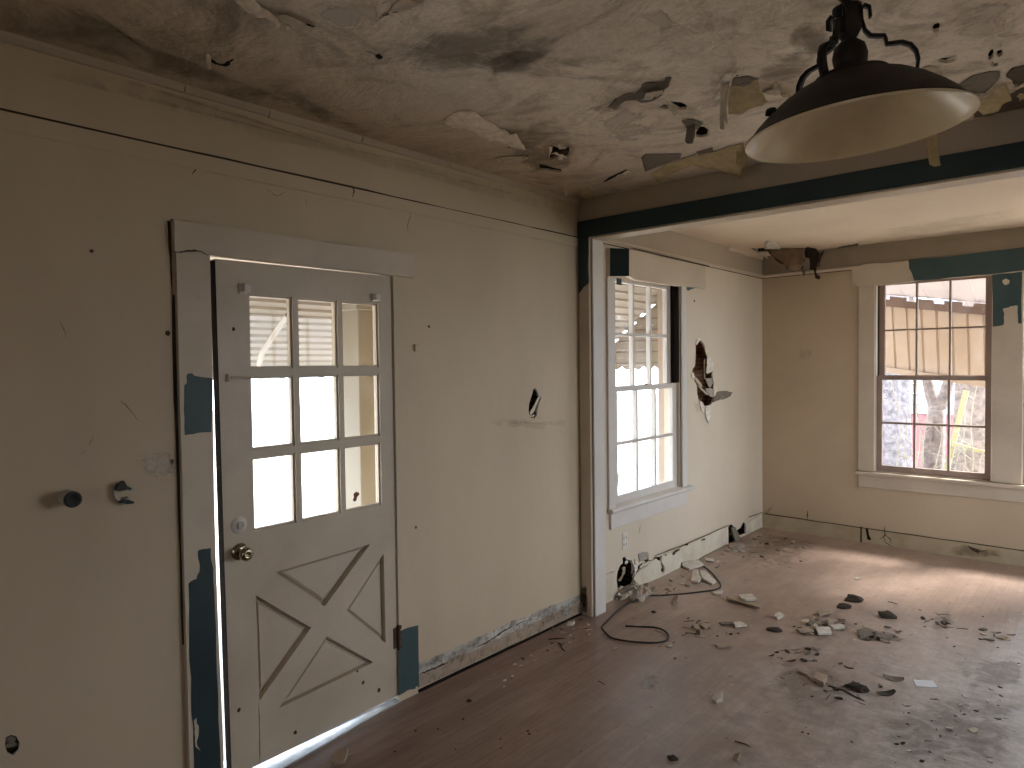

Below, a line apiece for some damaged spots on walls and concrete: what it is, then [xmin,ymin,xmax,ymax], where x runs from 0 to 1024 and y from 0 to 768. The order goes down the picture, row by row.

spalling [539,146,569,172]
peeling [587,77,688,111]
peeling [603,68,782,182]
peeling [960,49,1024,118]
peeling [908,247,1024,327]
peeling [184,373,212,435]
spalling [529,388,541,420]
spalling [691,337,733,423]
spalling [728,522,745,541]
spalling [617,543,688,590]
peeling [189,548,221,768]
flaking render [398,594,582,695]